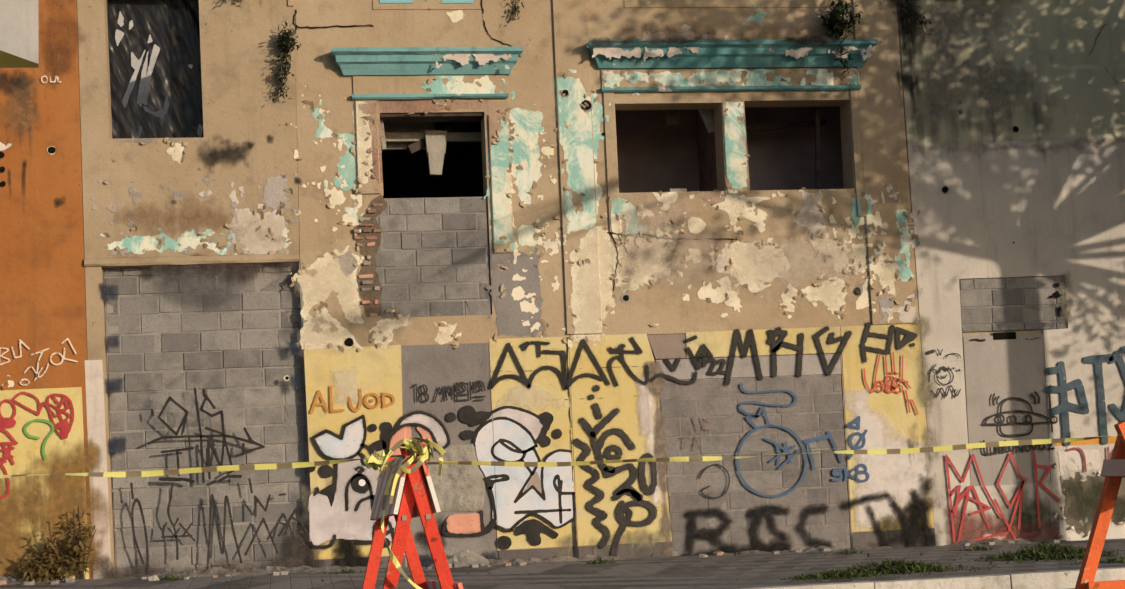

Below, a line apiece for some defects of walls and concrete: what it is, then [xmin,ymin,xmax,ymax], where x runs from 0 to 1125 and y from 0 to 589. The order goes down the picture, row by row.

crack [481,0,521,57]
leakage [891,0,1034,129]
leakage [0,74,35,136]
leakage [202,143,254,165]
peeling [90,24,924,353]
spalling [1050,445,1113,541]
peeling [1106,477,1125,539]